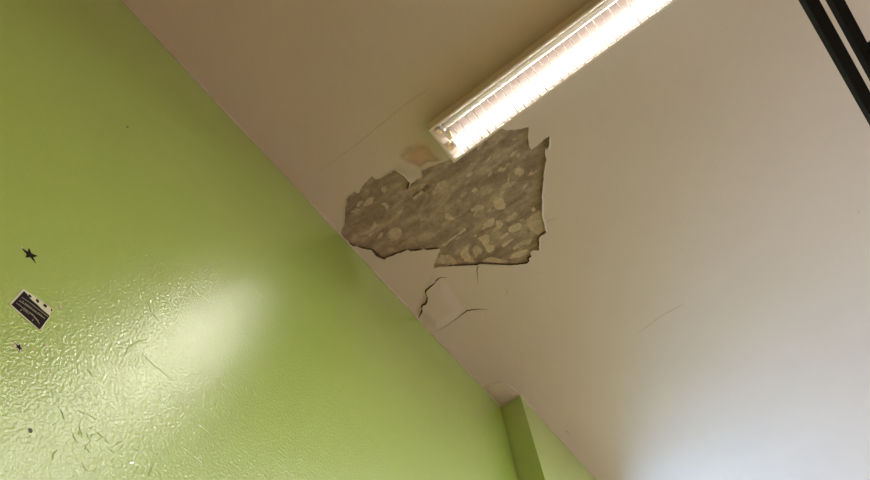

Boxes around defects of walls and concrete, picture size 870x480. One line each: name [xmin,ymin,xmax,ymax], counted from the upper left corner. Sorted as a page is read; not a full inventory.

flaking render [341,127,551,269]
crack [418,277,488,331]